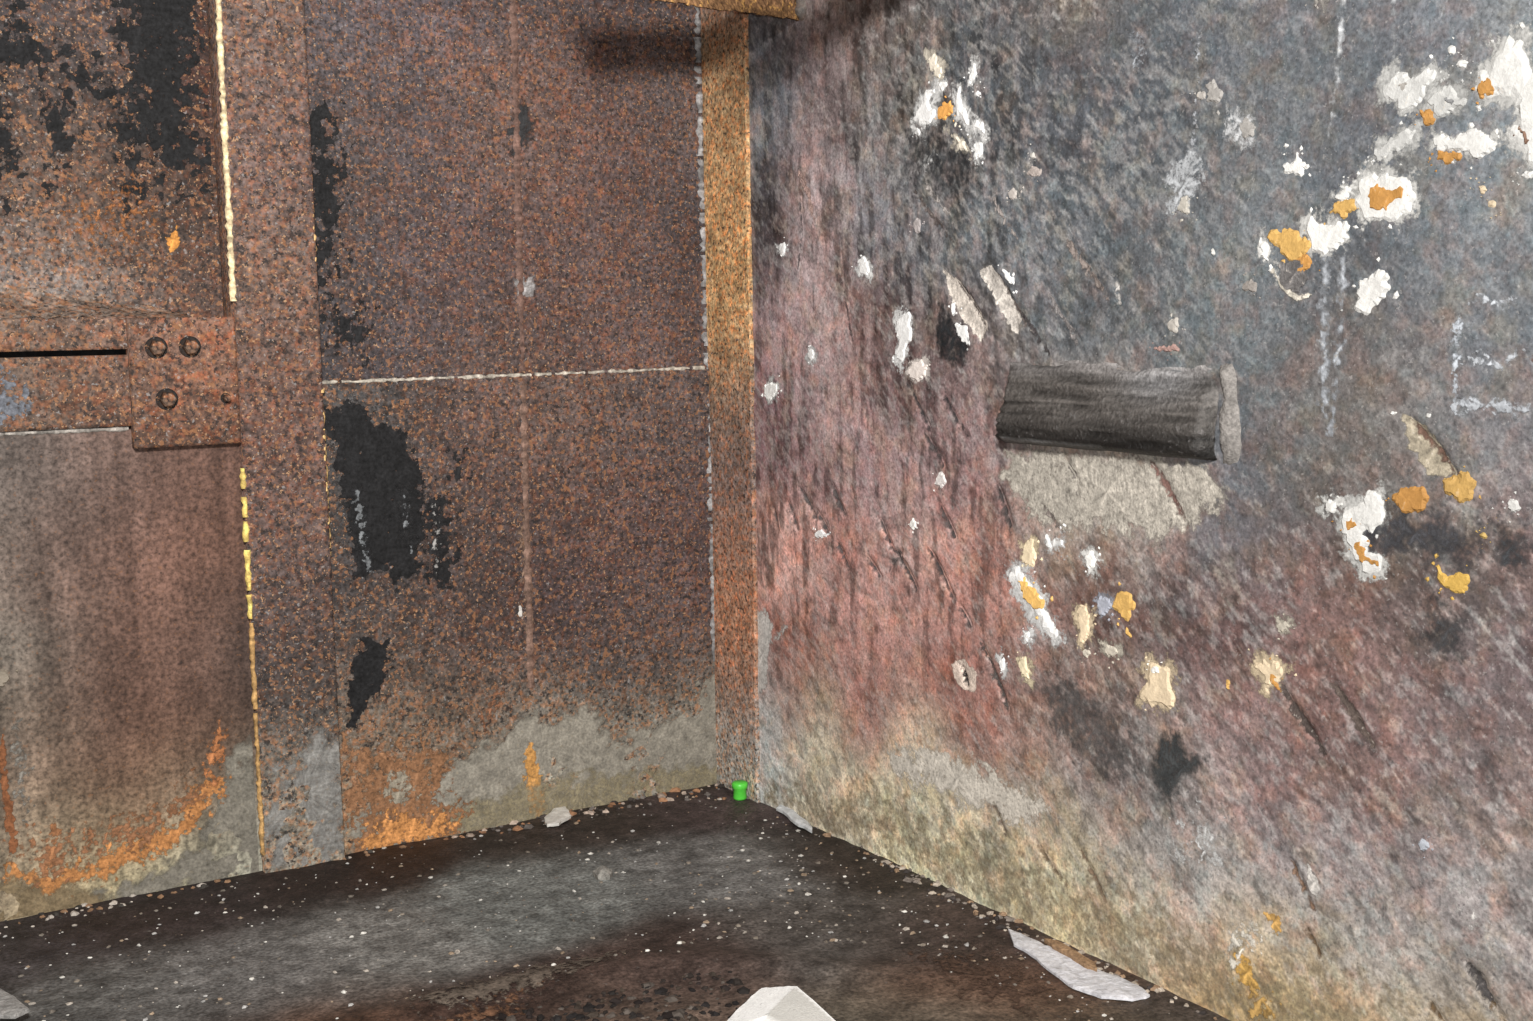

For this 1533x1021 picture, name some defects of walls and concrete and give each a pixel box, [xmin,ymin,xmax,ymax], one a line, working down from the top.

rust [38,154,180,269]
peeling [909,47,991,240]
spalling [892,265,1050,383]
peeling [1341,257,1399,315]
peeling [1238,22,1533,301]
rust [511,497,535,635]
spalling [951,444,1229,715]
peeling [1315,411,1521,583]
rust [0,718,232,896]
rust [340,722,476,853]
water stain [767,739,1400,1021]
water stain [1412,837,1434,858]